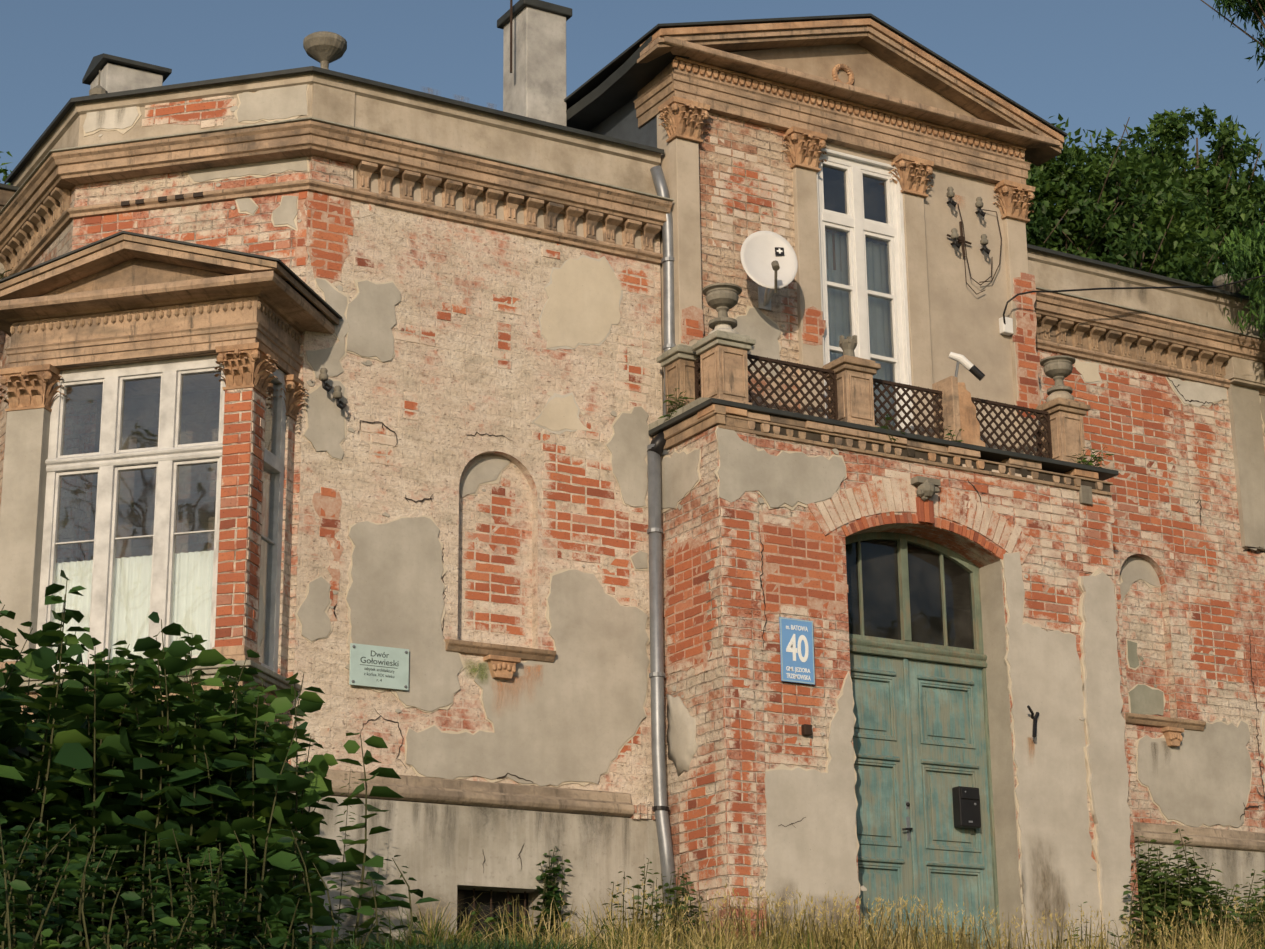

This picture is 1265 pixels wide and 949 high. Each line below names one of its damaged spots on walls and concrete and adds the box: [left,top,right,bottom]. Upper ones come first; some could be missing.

flaking render [142,95,238,129]
flaking render [82,191,378,291]
flaking render [710,136,791,266]
flaking render [681,306,704,344]
flaking render [779,279,826,353]
flaking render [532,330,651,607]
flaking render [865,272,1265,704]
flaking render [462,478,527,637]
flaking render [663,492,848,908]